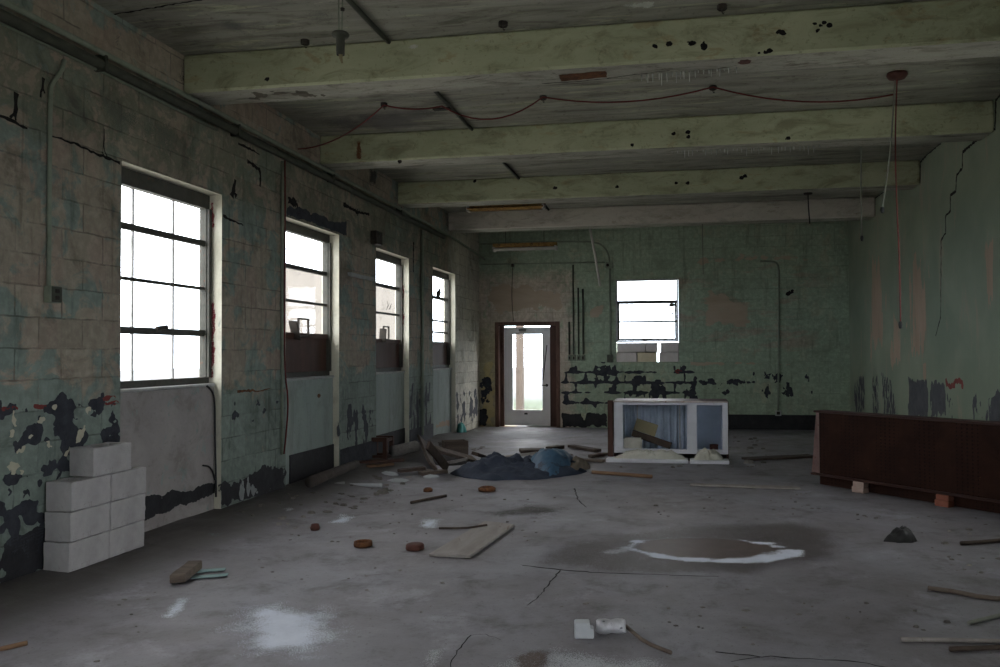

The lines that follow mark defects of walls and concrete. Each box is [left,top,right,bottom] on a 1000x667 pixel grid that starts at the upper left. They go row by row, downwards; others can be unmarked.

crack [52,129,120,165]
crack [920,95,1000,249]
peeling [561,362,793,428]
peeling [854,372,895,414]
peeling [908,377,953,418]
peeling [971,389,1000,421]
peeling [0,392,120,583]
peeling [145,464,287,521]
damp [533,522,855,575]
crack [522,565,691,605]